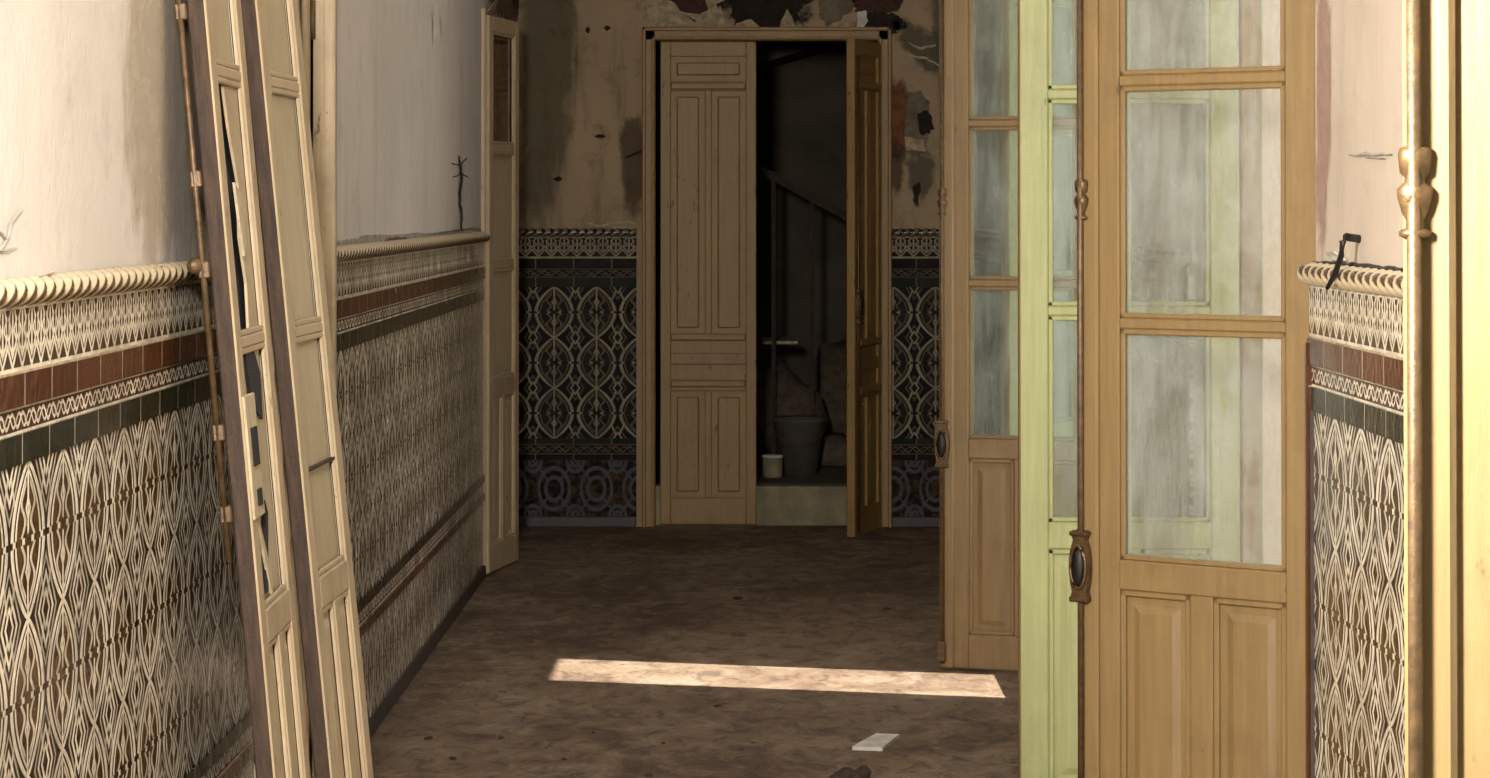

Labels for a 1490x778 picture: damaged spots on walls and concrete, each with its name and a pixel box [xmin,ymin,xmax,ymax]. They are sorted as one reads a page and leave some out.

spalling [647,0,904,34]
water stain [621,119,642,215]
peeling [904,91,935,206]